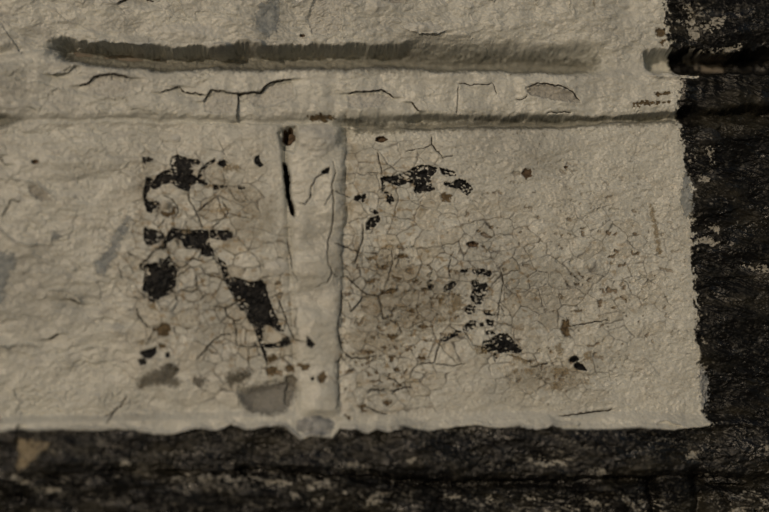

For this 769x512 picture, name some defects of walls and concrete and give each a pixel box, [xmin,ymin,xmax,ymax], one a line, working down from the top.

crack [161,79,291,119]
crack [456,83,497,113]
crack [516,82,580,114]
crack [159,191,248,229]
crack [141,248,262,361]
crack [271,293,306,343]
crack [283,162,403,409]
crack [418,340,464,367]
crack [366,376,411,414]